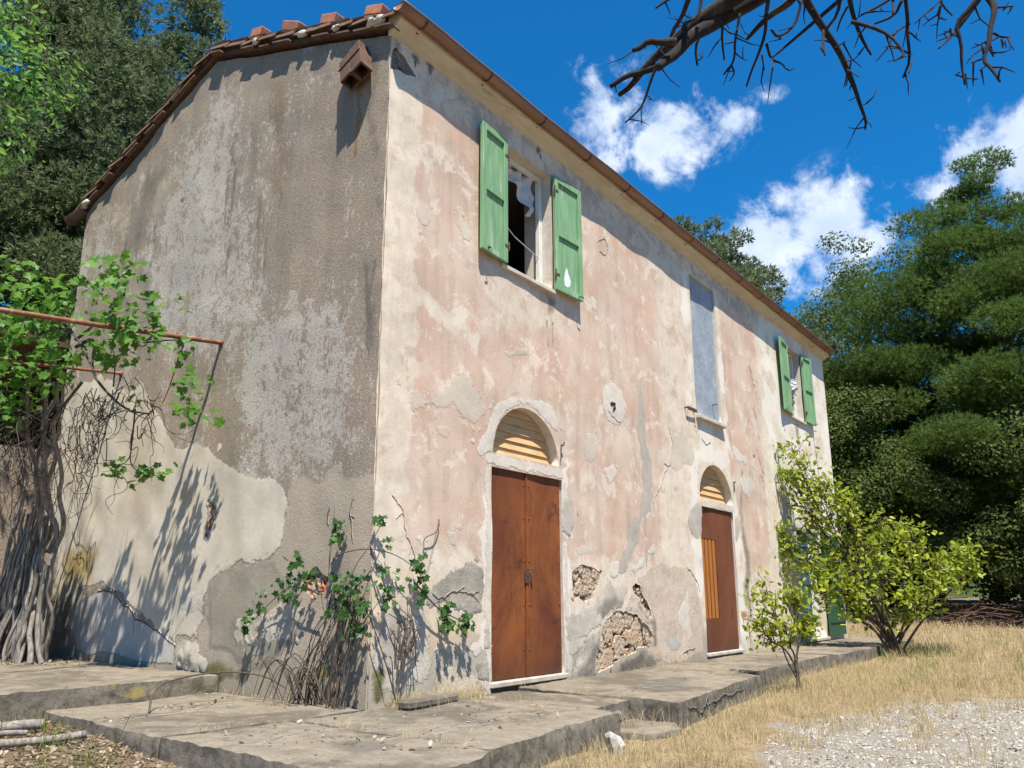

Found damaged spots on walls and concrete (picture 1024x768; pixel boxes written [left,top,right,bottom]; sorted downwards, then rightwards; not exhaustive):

flaking render [205,494,217,540]
crack [98,589,176,646]
peeling [180,585,208,613]
flaking render [302,566,330,610]
flaking render [571,544,704,673]
crack [628,647,744,717]